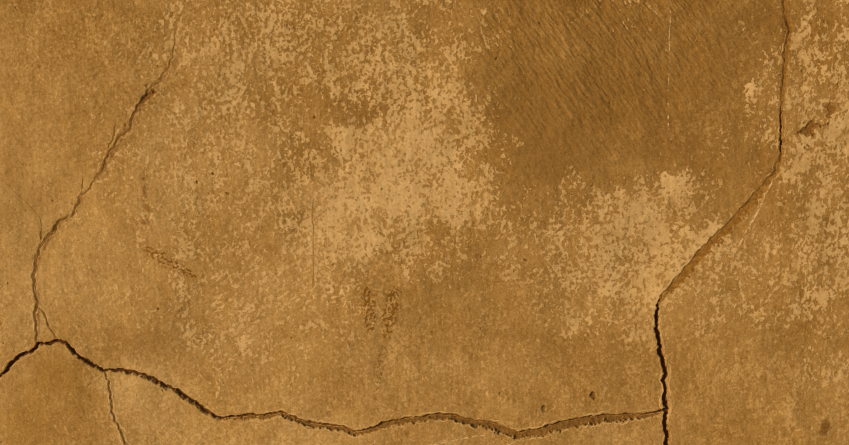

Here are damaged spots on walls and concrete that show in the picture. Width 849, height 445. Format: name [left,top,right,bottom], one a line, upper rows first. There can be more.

crack [151,36,177,88]
crack [780,0,792,107]
crack [0,89,787,445]